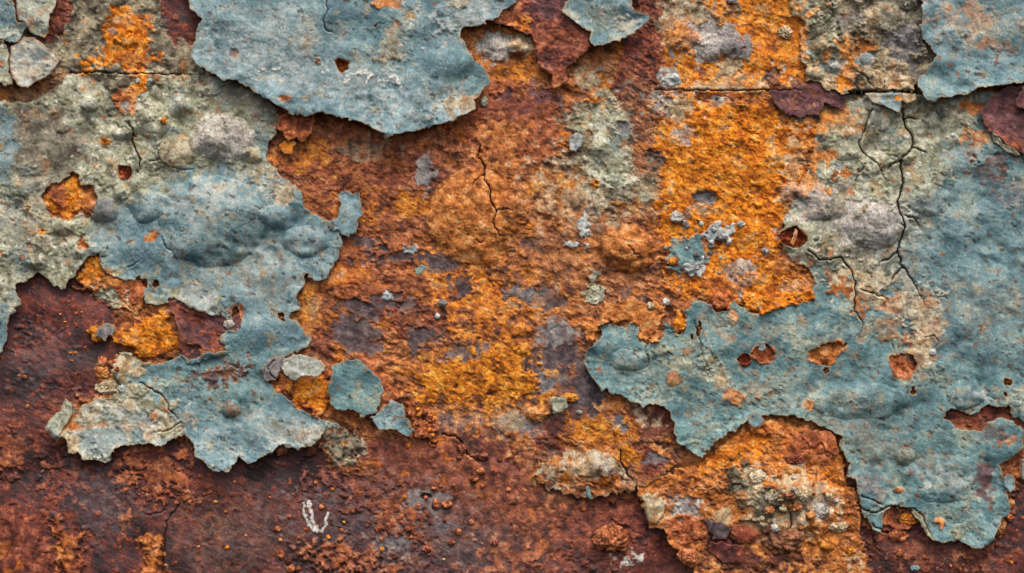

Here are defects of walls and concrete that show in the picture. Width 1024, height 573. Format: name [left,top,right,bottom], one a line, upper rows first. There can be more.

rust [489,0,591,90]
rust [72,255,241,365]
peeling [0,0,517,472]
rust [275,112,316,154]
crack [471,145,515,243]
rust [578,0,936,345]
peeling [584,0,1024,549]
crack [808,71,927,338]
rust [0,437,215,573]
rust [273,339,544,573]
rust [531,417,998,573]